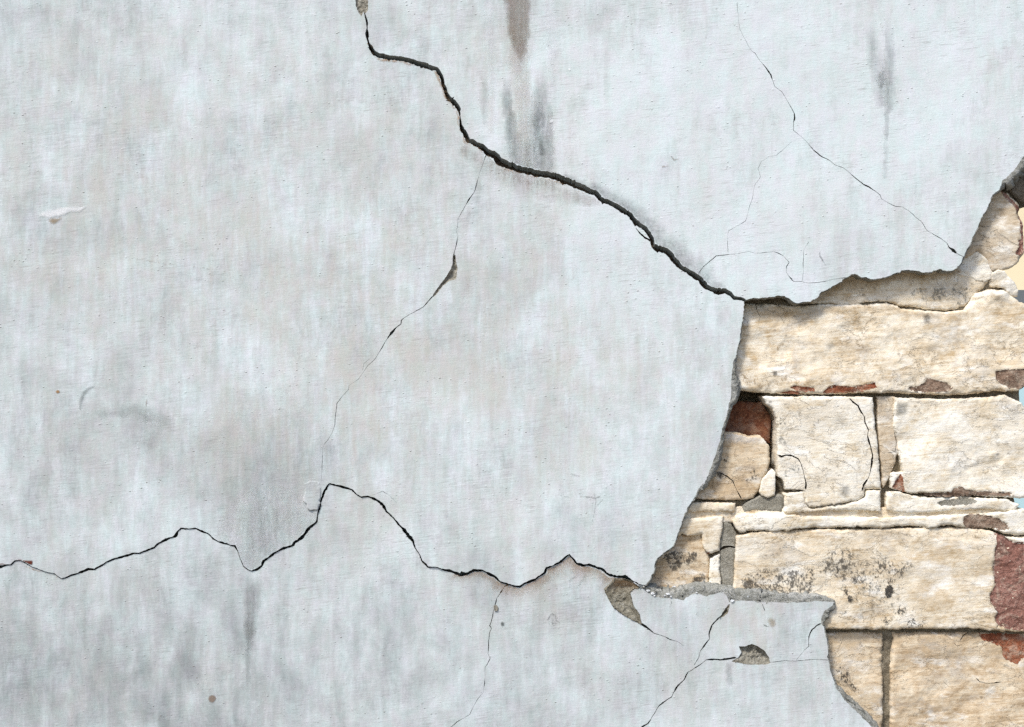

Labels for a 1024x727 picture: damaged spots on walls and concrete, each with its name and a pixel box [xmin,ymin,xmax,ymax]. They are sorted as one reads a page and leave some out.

crack [364,7,962,322]
crack [0,297,643,727]
crack [778,454,807,491]
spalling [604,157,1024,727]
crack [849,398,896,490]
crack [642,616,736,727]
crack [776,623,822,662]